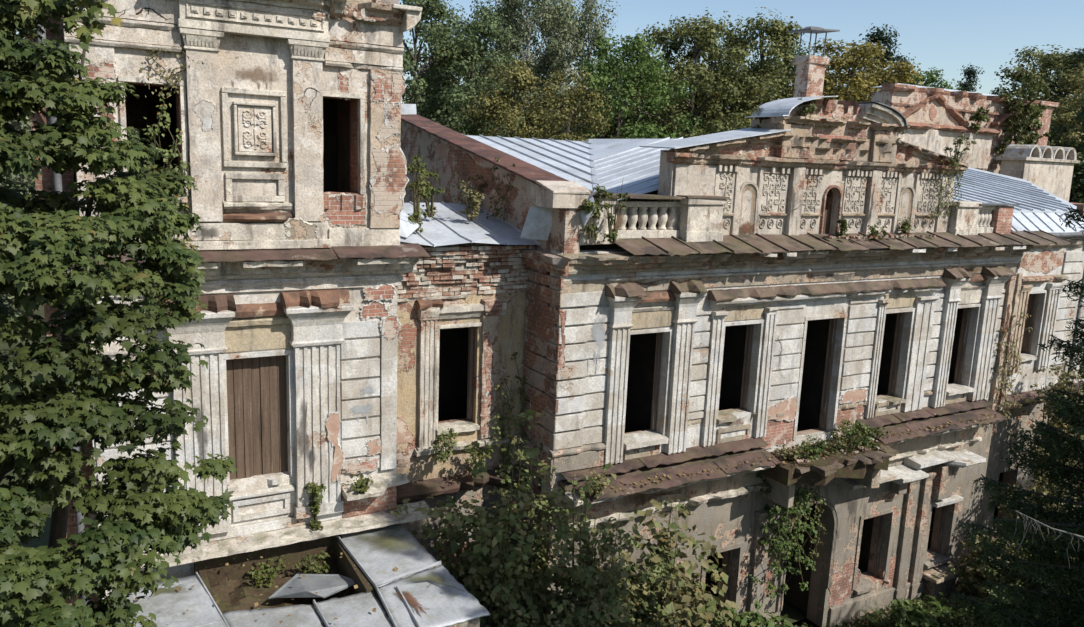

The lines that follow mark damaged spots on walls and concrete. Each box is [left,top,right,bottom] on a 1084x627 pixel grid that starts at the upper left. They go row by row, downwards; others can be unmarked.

flaking render [308,10,330,21]
flaking render [345,4,392,22]
flaking render [337,67,350,100]
flaking render [283,72,409,240]
peeling [359,282,419,374]
flaking render [527,290,567,371]
peeling [325,411,381,484]
flaking render [761,396,798,449]
flaking render [834,388,869,436]